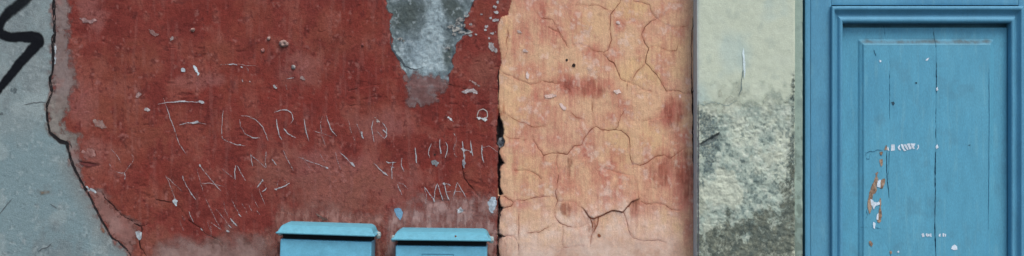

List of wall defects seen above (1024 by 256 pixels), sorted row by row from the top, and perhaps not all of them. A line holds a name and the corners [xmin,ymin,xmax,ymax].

peeling [44,0,142,256]
flaking render [386,0,499,108]
crack [462,0,743,256]
water stain [697,76,795,256]
peeling [866,143,919,229]